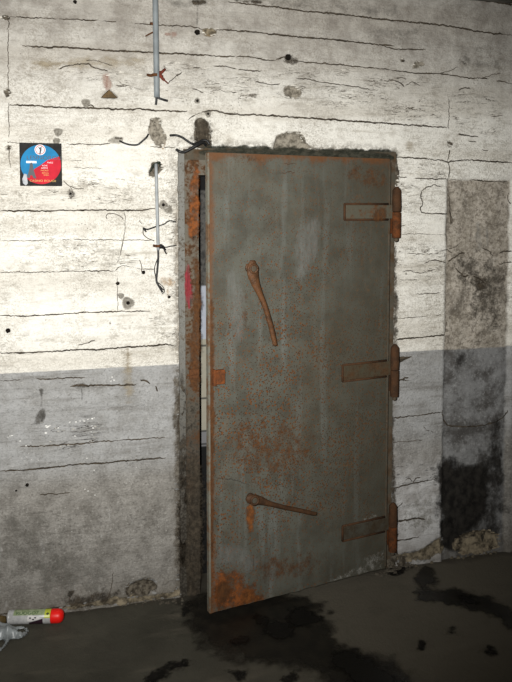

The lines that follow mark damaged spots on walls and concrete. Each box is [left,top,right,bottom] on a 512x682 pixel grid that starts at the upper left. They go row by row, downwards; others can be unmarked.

crack [228,1,511,35]
spalling [148,117,167,148]
crack [7,16,512,283]
spalling [271,131,311,150]
crack [0,180,155,317]
corrosion [189,259,202,370]
crack [0,340,174,354]
crack [2,457,165,472]
damp [438,420,503,551]
spalling [387,537,444,568]
spalling [452,529,500,555]
corrosion [212,571,263,611]